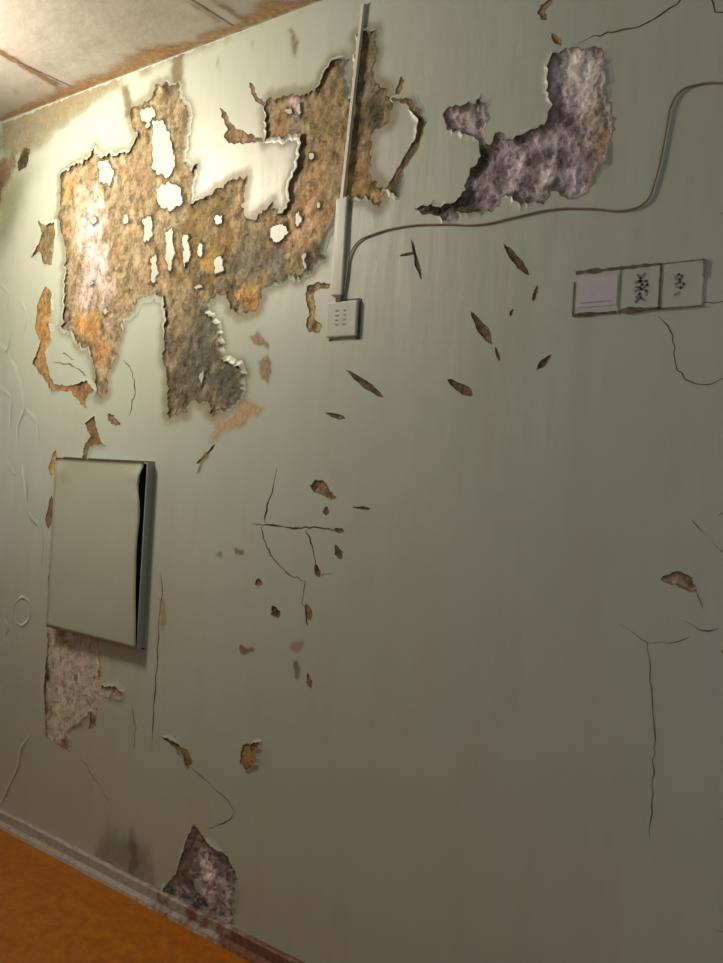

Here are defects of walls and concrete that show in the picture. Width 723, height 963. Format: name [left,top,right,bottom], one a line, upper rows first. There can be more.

crack [578,0,681,44]
flaking render [415,33,617,223]
peeling [31,27,427,459]
peeling [504,244,529,275]
peeling [447,379,473,396]
peeling [471,312,500,361]
crack [658,316,723,385]
crack [251,470,340,626]
peeling [42,627,126,753]
peeling [240,738,263,774]
crack [623,592,716,836]
flaking render [159,824,240,925]